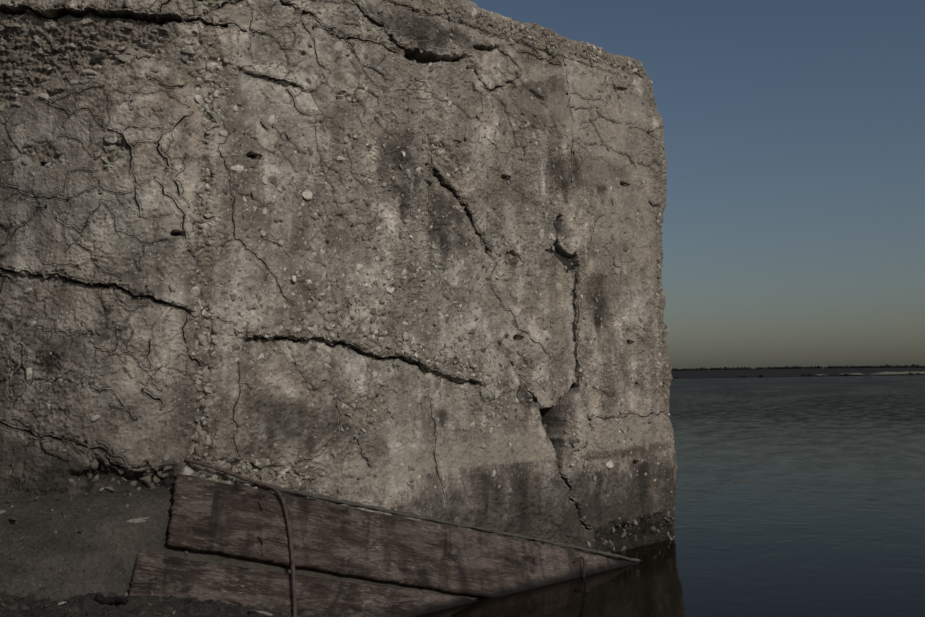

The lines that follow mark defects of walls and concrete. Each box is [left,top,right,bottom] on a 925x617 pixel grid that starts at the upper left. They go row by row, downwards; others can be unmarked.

crack [0,365,148,478]
crack [0,73,204,422]
crack [0,0,662,239]
spalling [0,0,675,551]
crack [216,118,668,509]
crack [556,459,593,532]